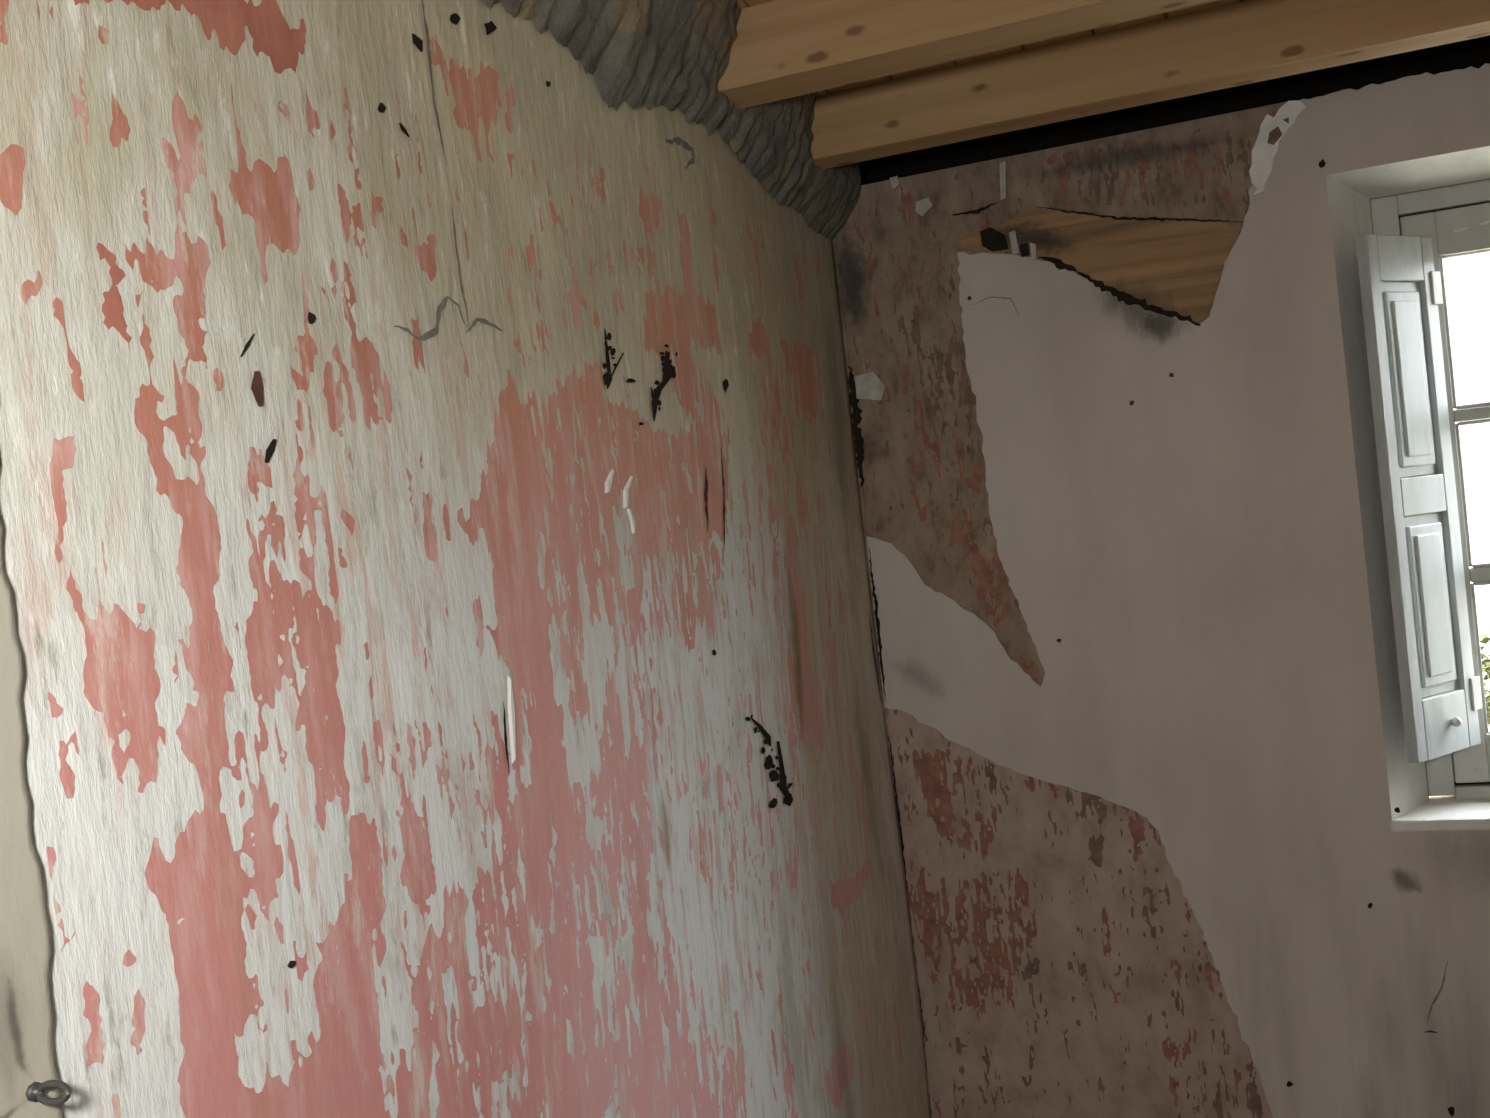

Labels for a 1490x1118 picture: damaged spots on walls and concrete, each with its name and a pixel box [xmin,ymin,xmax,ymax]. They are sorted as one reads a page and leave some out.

peeling [74,0,306,74]
peeling [110,87,130,147]
peeling [0,144,25,216]
peeling [21,270,84,402]
peeling [96,242,132,349]
crack [394,209,504,340]
peeling [49,436,76,563]
peeling [125,0,1306,1118]
peeling [66,538,165,793]
peeling [58,732,79,798]
peeling [46,846,75,952]
peeling [83,981,105,1067]